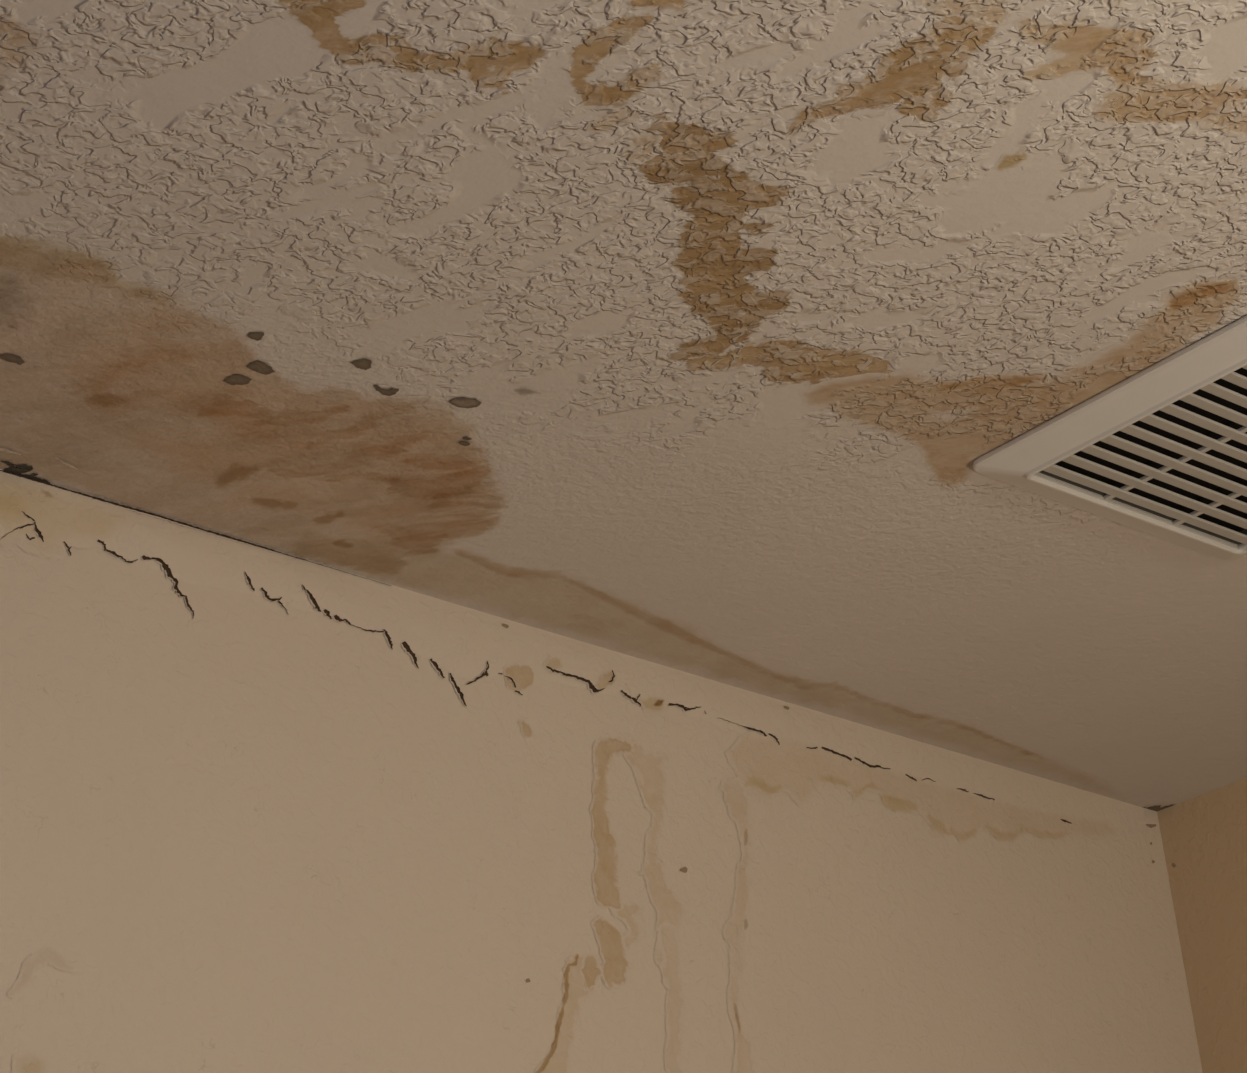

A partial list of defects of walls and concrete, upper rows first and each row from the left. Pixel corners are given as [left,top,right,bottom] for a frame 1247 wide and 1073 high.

water stain [275,0,548,96]
water stain [0,230,514,586]
water stain [568,0,1247,490]
crack [0,470,523,706]
water stain [503,656,564,692]
crack [546,666,995,801]
water stain [535,736,687,1073]
water stain [718,733,1119,1073]